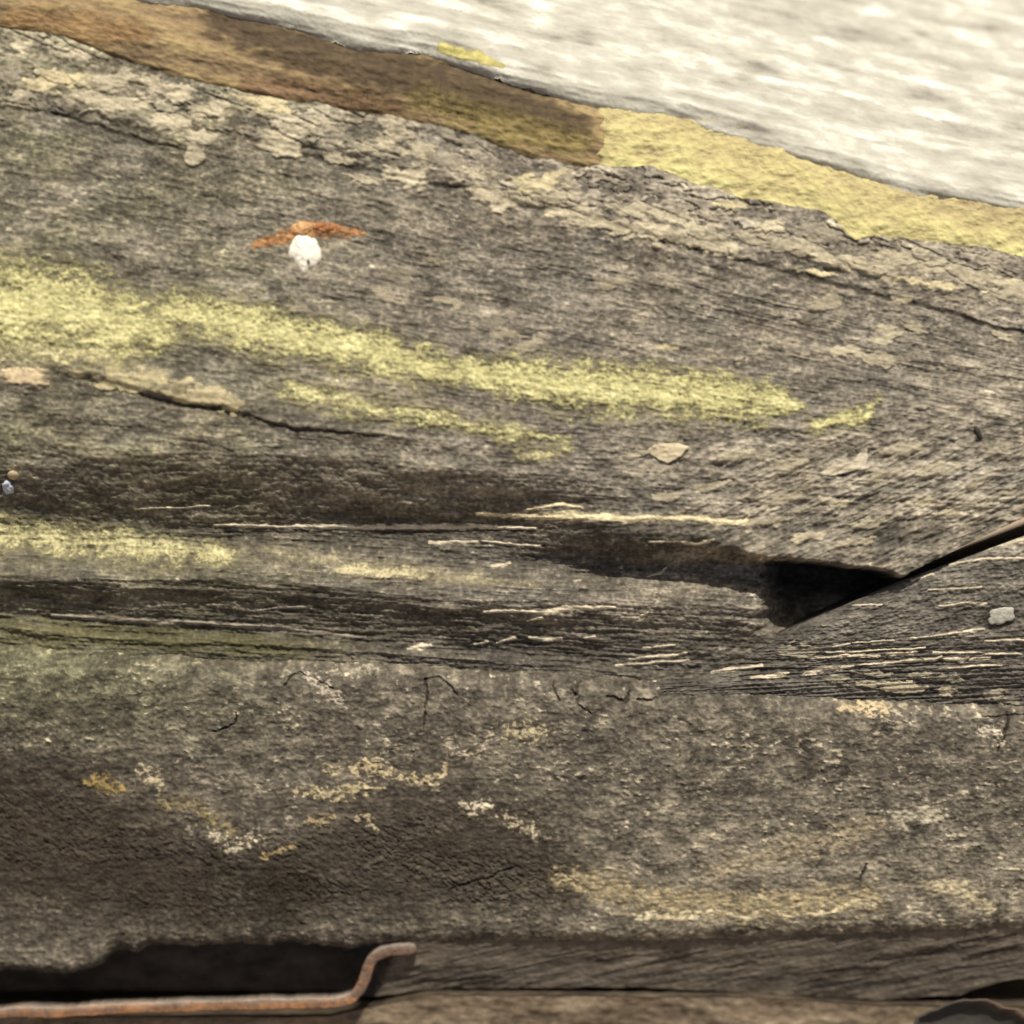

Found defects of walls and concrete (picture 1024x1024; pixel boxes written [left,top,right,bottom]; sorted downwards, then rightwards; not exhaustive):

rust [252,222,366,249]